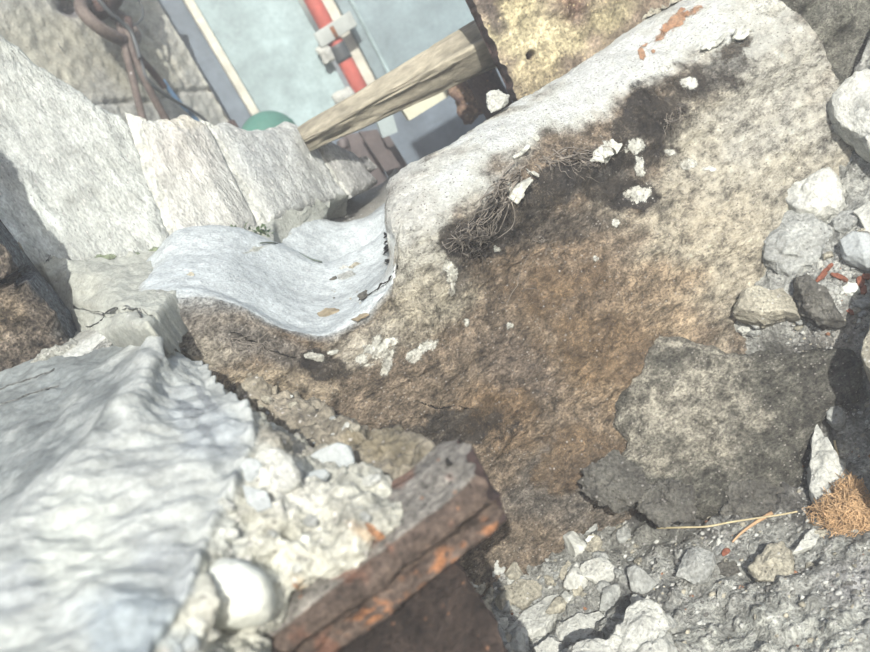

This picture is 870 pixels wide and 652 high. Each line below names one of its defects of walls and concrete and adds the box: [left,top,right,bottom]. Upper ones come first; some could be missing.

corrosion [638,5,704,60]
leakage [436,36,753,266]
leakage [502,261,655,385]
leakage [298,347,353,381]
leakage [407,388,537,446]
leakage [531,425,623,495]
corrosion [365,523,385,541]